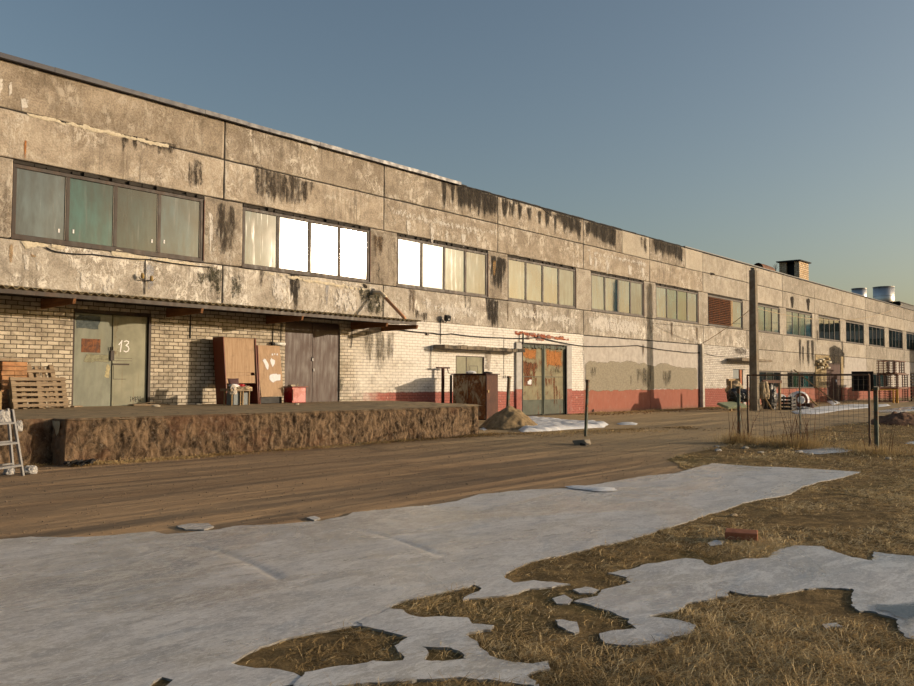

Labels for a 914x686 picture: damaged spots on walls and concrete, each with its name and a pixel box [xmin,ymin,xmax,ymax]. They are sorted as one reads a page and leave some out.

water stain [254,165,313,203]
water stain [208,204,237,253]
water stain [442,181,616,245]
water stain [641,237,683,261]
water stain [491,256,506,289]
water stain [359,287,385,315]
water stain [486,298,509,327]
rust [523,349,562,404]